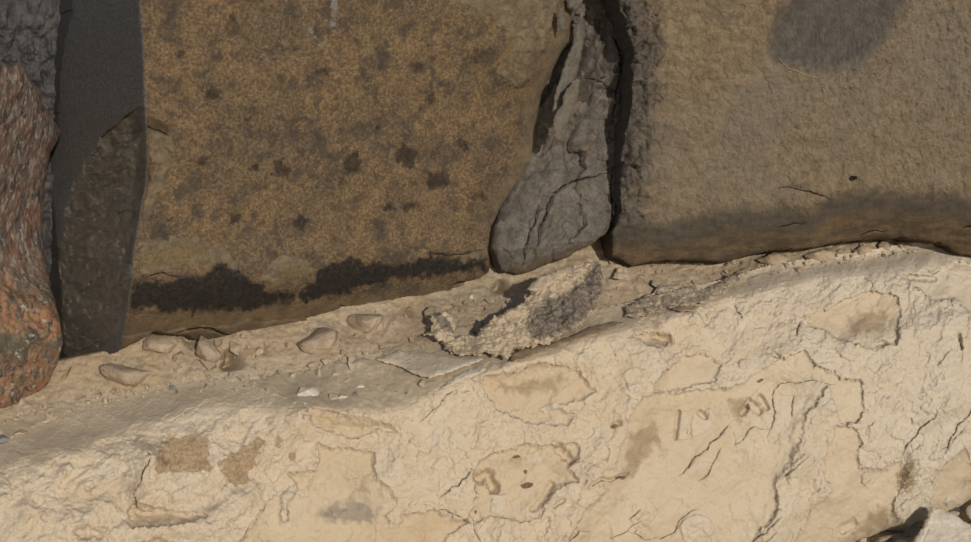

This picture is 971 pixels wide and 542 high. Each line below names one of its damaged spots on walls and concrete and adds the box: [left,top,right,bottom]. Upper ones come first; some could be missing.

crack [427,0,623,275]
water stain [131,255,486,314]
crack [903,411,971,471]